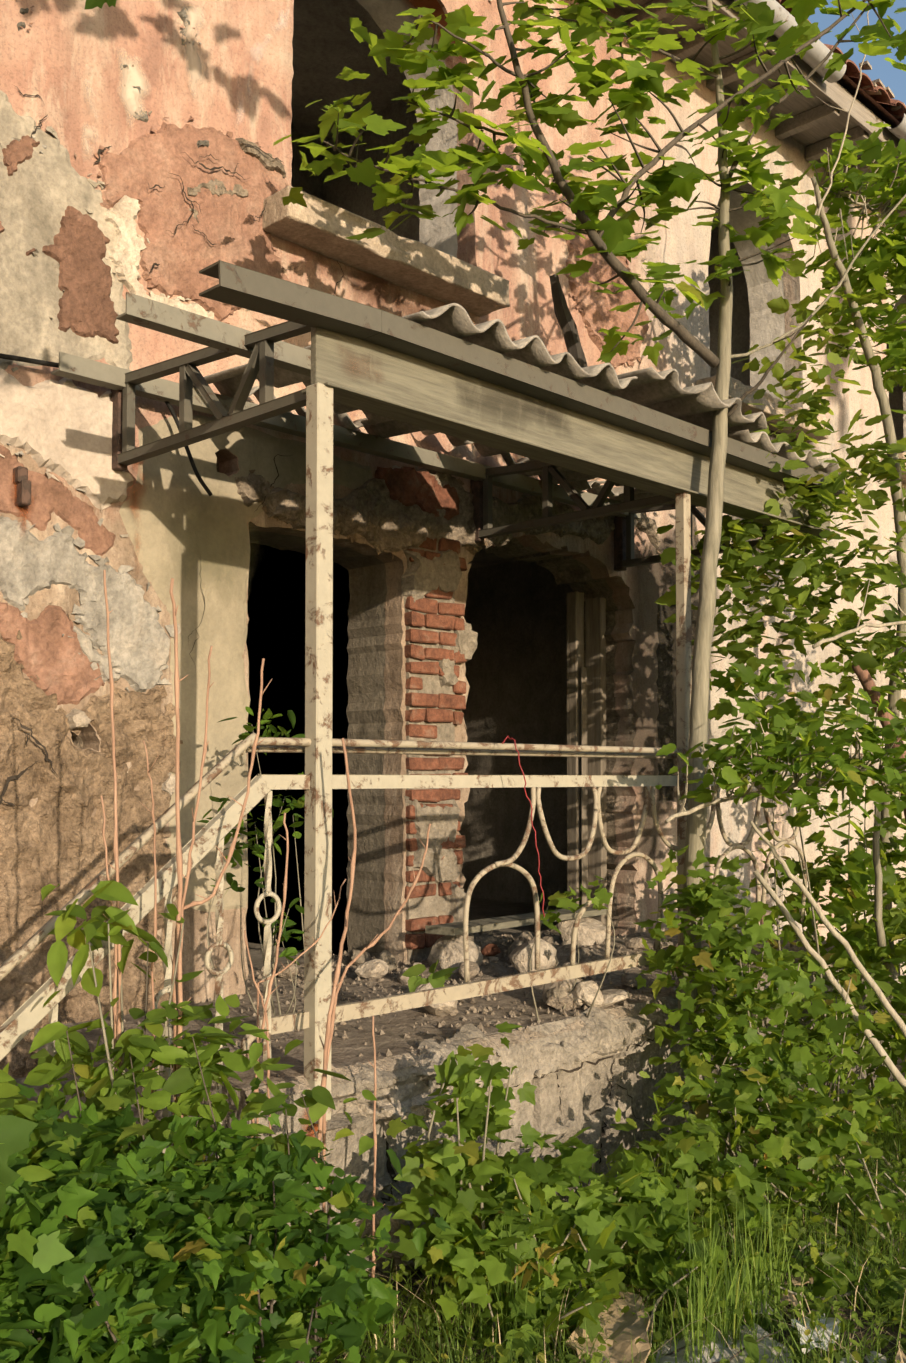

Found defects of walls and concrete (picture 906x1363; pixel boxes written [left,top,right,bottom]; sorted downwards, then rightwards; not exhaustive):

spalling [120,64,152,122]
flaking render [0,90,214,1026]
flaking render [235,470,306,530]
flaking render [333,465,615,560]
flaking render [634,513,661,554]
crack [0,718,59,806]
flaking render [0,885,185,1079]